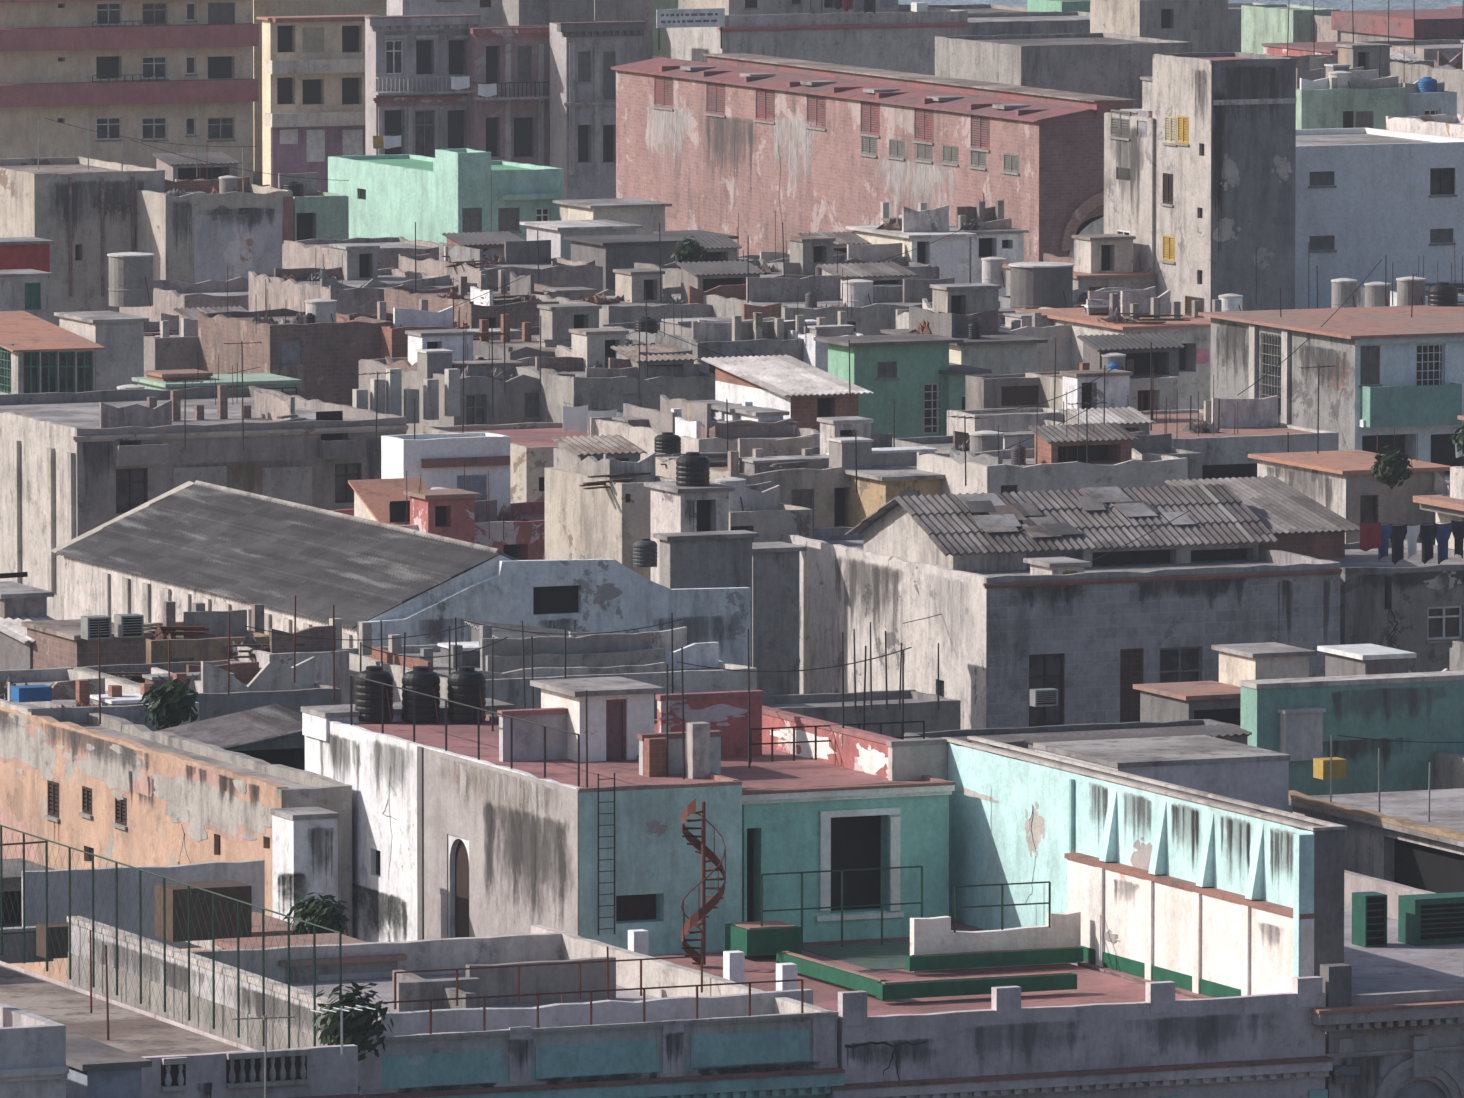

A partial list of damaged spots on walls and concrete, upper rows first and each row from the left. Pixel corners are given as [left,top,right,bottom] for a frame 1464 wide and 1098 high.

flaking render [0,713,272,842]
peeling [770,729,836,759]
peeling [856,743,888,775]
damp [484,803,565,911]
peeling [1025,801,1045,858]
damp [1094,786,1145,836]
damp [1171,805,1198,862]
damp [1221,817,1250,866]
damp [1270,830,1292,876]
crack [845,1041,927,1081]